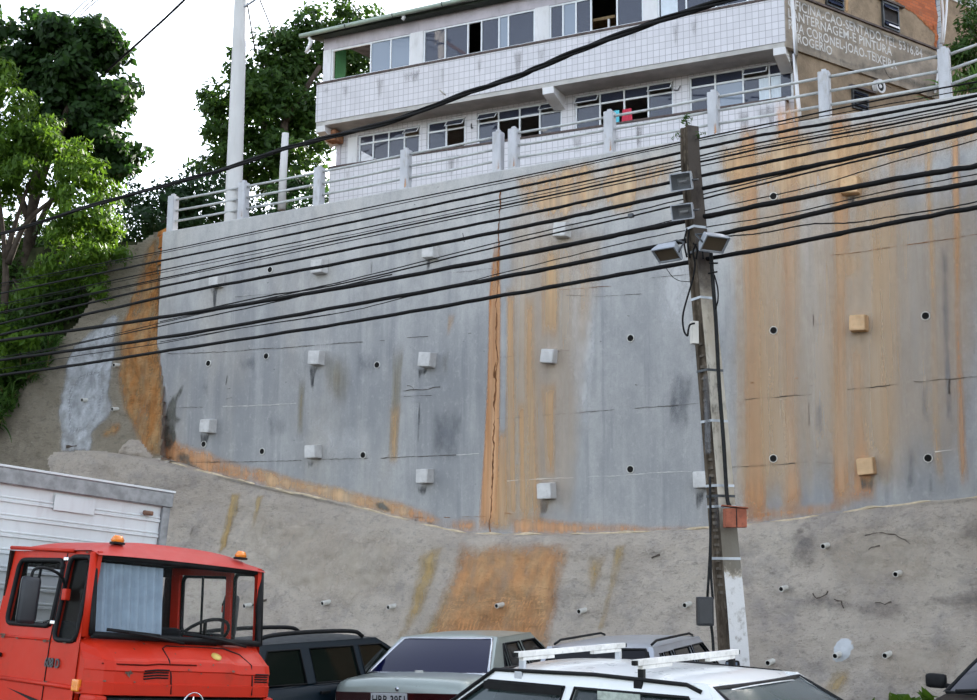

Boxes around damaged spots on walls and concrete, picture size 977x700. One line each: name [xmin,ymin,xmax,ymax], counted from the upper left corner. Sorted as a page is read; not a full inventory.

rust [120,243,434,522]
crack [290,192,607,532]
rust [459,252,596,533]
rust [726,111,976,519]
rust [433,547,563,642]